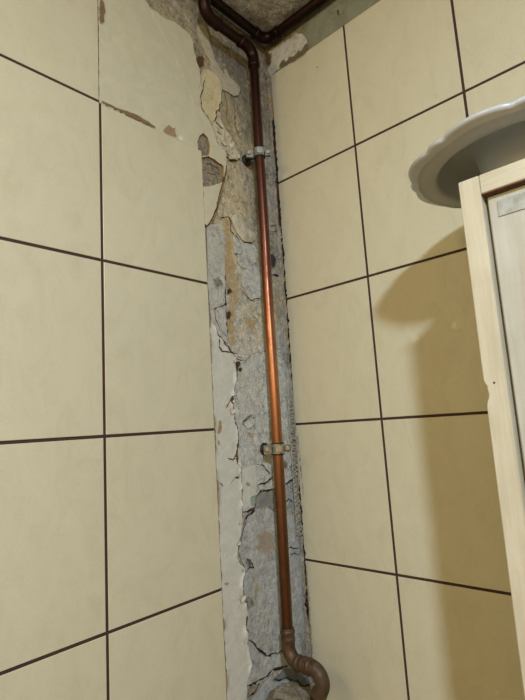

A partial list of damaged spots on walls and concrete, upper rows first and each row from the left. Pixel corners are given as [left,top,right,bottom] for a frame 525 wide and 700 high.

crack [146,2,253,254]
peeling [98,0,310,700]
crack [215,275,259,487]
crack [271,113,292,377]
crack [245,464,309,619]
crack [245,600,310,698]